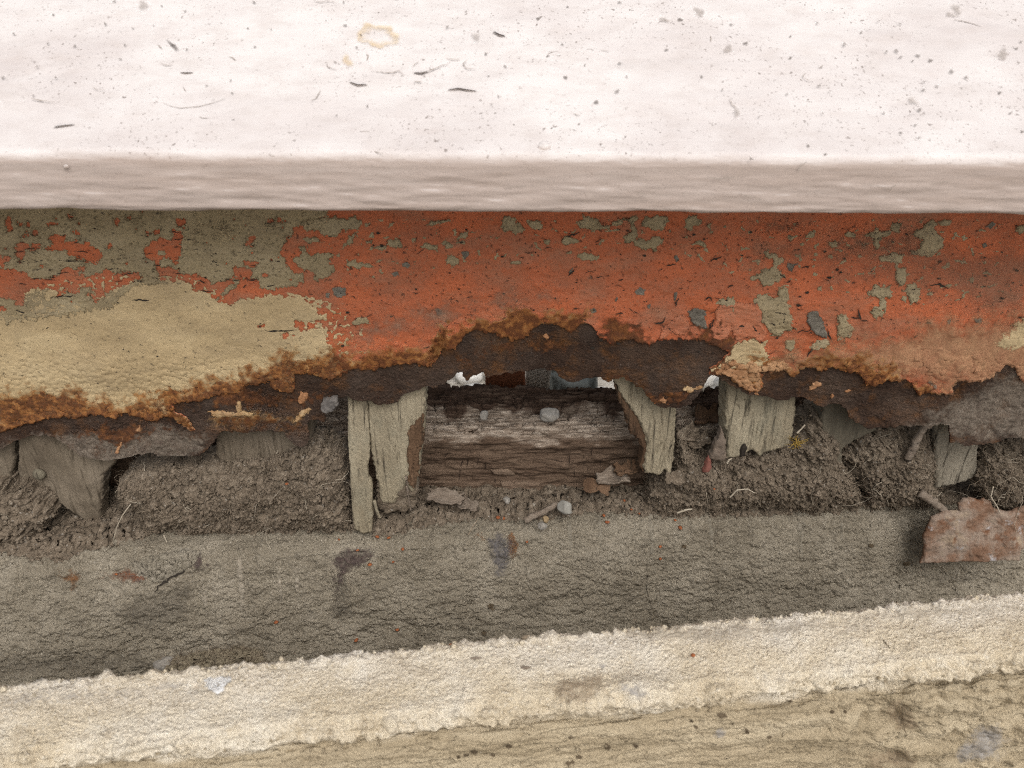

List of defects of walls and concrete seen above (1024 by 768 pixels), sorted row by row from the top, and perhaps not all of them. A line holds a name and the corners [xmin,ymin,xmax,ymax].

peeling [326,287,346,298]
peeling [688,308,708,329]
peeling [796,291,828,338]
peeling [207,401,253,419]
peeling [294,382,339,422]
corrosion [0,308,1024,460]